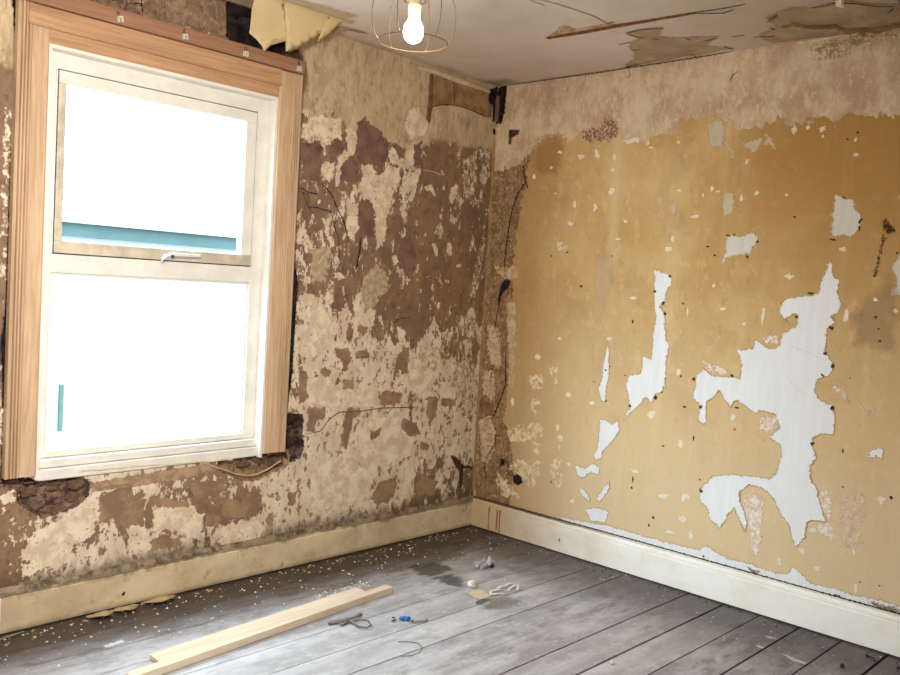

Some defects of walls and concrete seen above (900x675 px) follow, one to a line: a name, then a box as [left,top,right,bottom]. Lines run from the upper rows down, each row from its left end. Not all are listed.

spalling [226,1,303,61]
peeling [0,107,12,237]
peeling [302,115,358,187]
peeling [346,107,436,265]
peeling [432,242,461,268]
peeling [449,157,478,204]
crack [504,157,528,271]
peeling [0,413,305,577]
peeling [307,375,415,511]
peeling [390,326,406,358]
peeling [454,314,502,409]
crack [484,354,514,477]